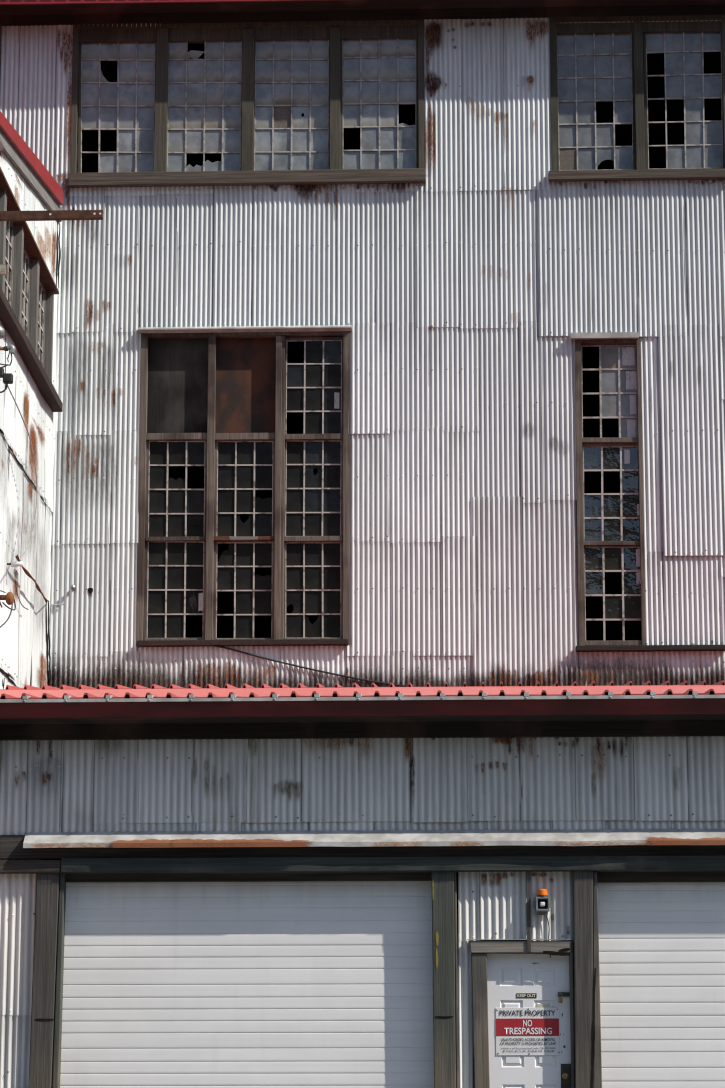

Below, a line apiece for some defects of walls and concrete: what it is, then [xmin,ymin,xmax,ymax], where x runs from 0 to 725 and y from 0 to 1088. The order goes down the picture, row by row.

corrosion [57,31,73,154]
corrosion [425,22,491,162]
corrosion [56,173,84,227]
corrosion [25,395,45,498]
corrosion [199,662,240,687]
damp [49,664,725,688]
corrosion [491,670,555,686]
corrosion [35,838,311,848]
corrosion [557,837,725,846]